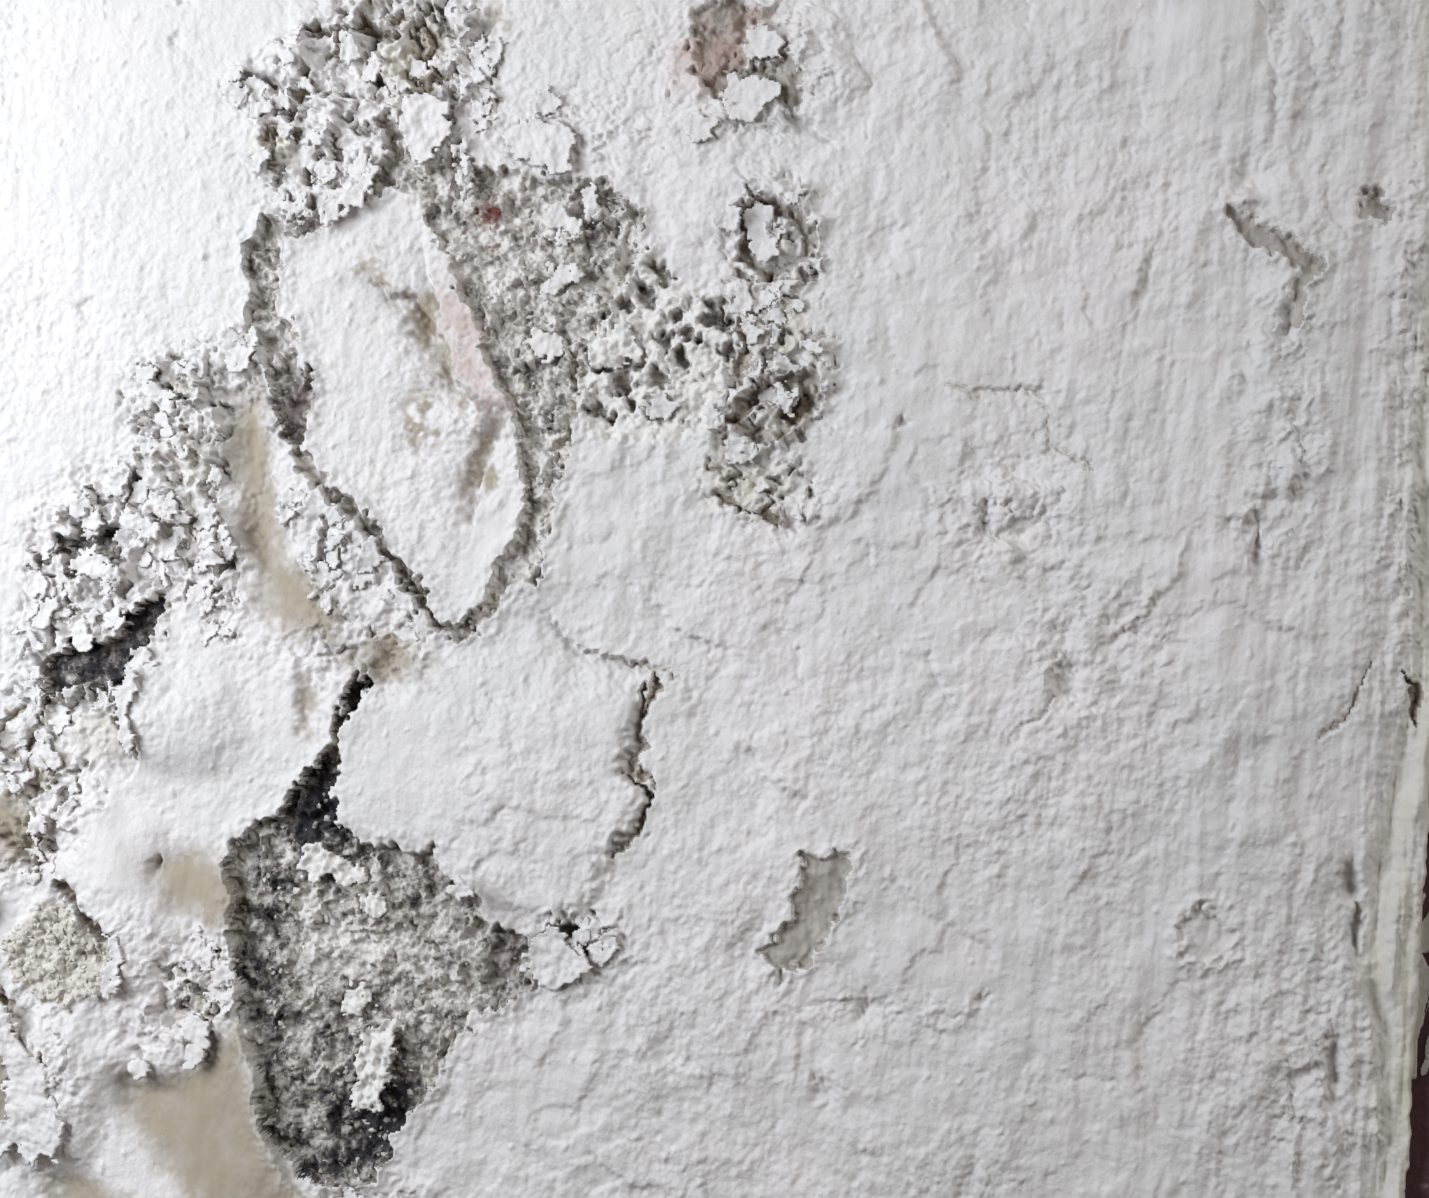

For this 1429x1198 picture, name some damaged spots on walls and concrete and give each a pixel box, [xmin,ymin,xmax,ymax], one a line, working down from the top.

flaking render [0,0,853,1198]
crack [608,654,681,860]